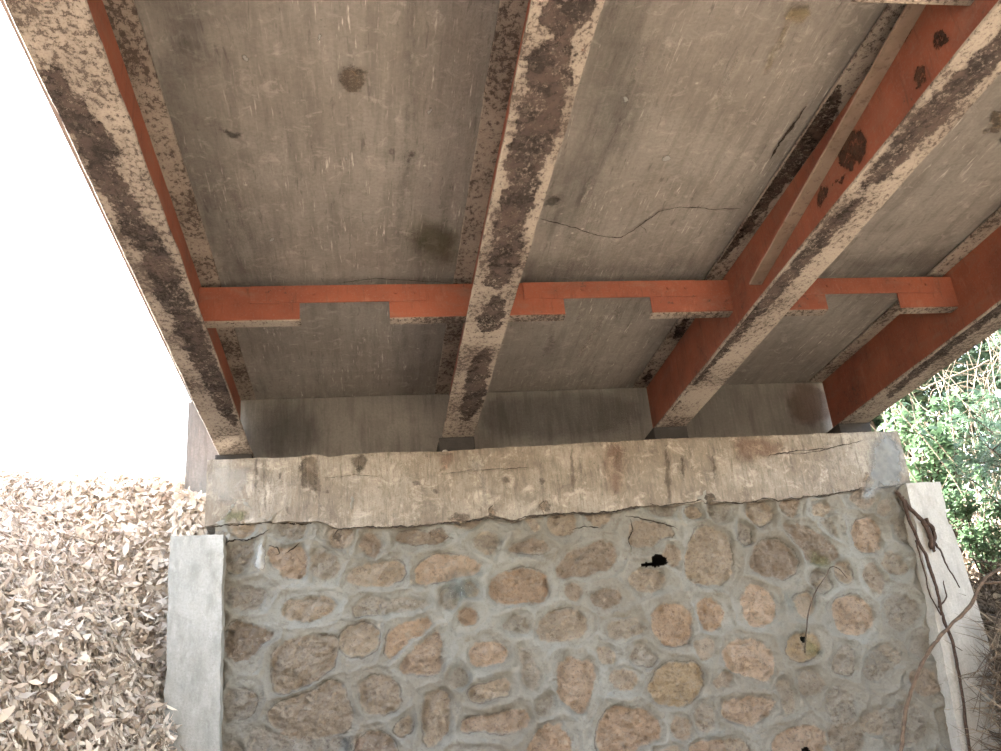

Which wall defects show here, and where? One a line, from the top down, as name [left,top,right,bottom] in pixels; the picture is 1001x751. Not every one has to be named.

crack [771,107,806,158]
crack [540,207,741,238]
rust [671,25,1001,411]
crack [768,440,863,456]
crack [207,521,313,555]
crack [334,487,866,546]